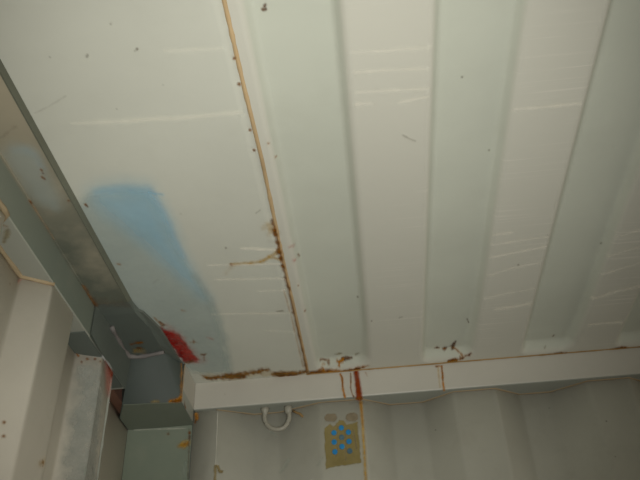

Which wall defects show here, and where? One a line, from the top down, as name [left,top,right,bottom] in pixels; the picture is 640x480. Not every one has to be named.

corrosion [204,353,366,477]